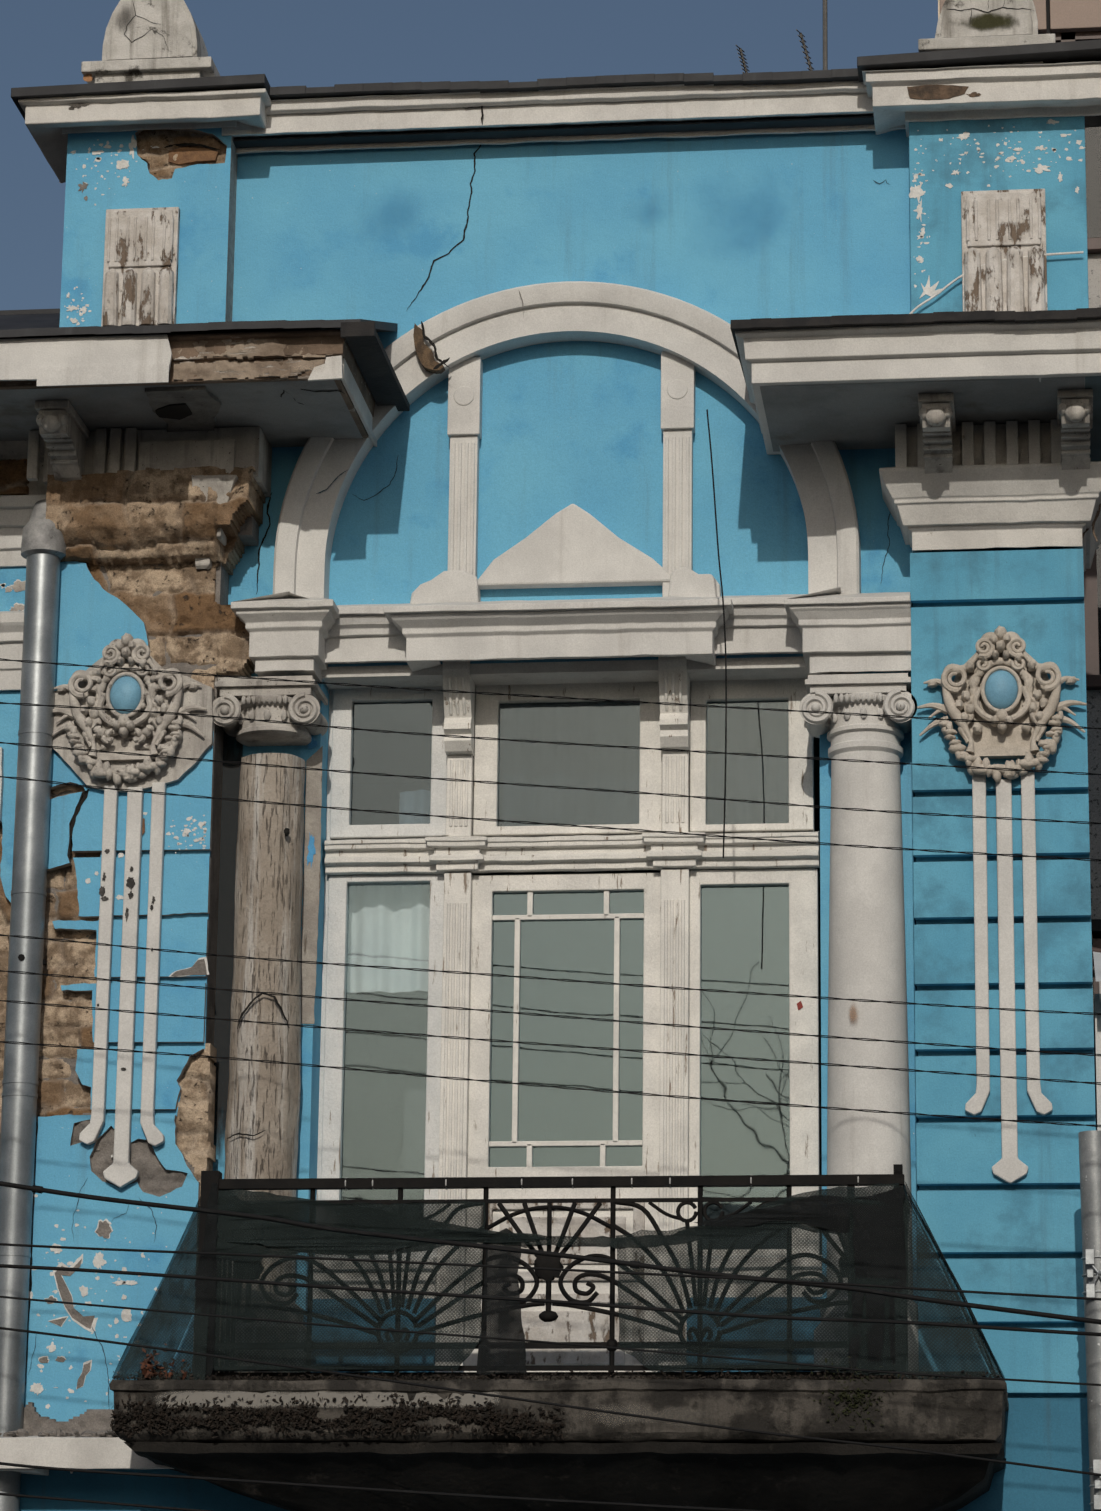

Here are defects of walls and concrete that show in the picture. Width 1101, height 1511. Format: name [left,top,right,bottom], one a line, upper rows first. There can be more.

spalling [70,129,227,206]
crack [407,106,484,309]
peeling [909,119,1085,299]
flaking render [0,459,266,689]
flaking render [50,785,85,800]
crack [68,789,89,862]
peeling [166,815,207,853]
flaking render [0,823,11,1133]
flaking render [36,842,217,1214]
spalling [23,1210,157,1436]